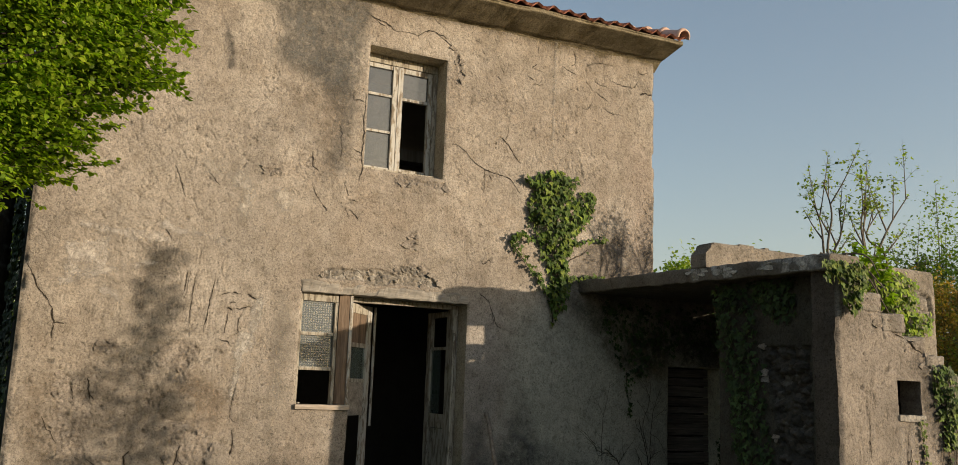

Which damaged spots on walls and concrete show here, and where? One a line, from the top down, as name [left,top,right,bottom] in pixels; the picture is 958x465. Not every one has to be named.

crack [367,12,452,46]
crack [562,51,652,115]
crack [27,263,64,338]
crack [184,273,257,344]
spalling [320,265,442,289]
spalling [46,372,91,465]
spalling [168,421,212,465]
crack [218,371,238,455]